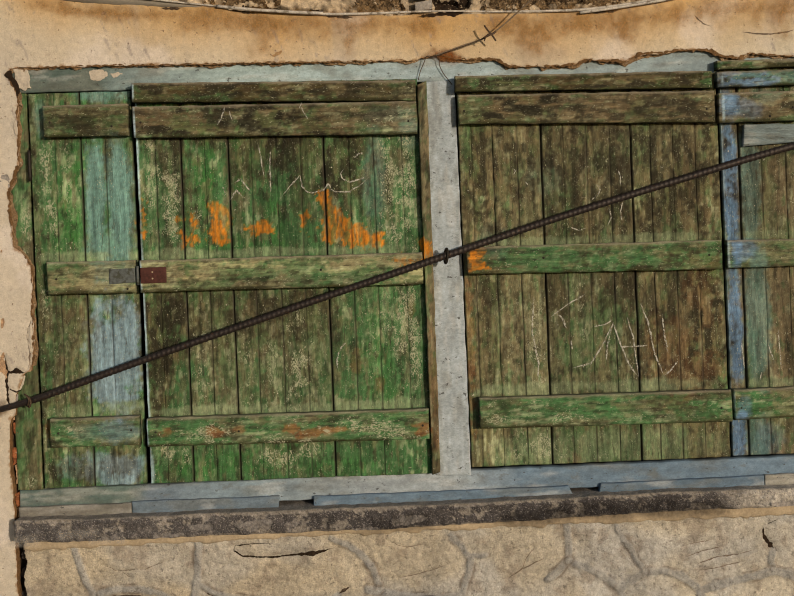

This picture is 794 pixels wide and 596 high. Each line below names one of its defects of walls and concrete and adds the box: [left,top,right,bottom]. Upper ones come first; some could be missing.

spalling [0,50,420,366]
spalling [0,352,25,402]